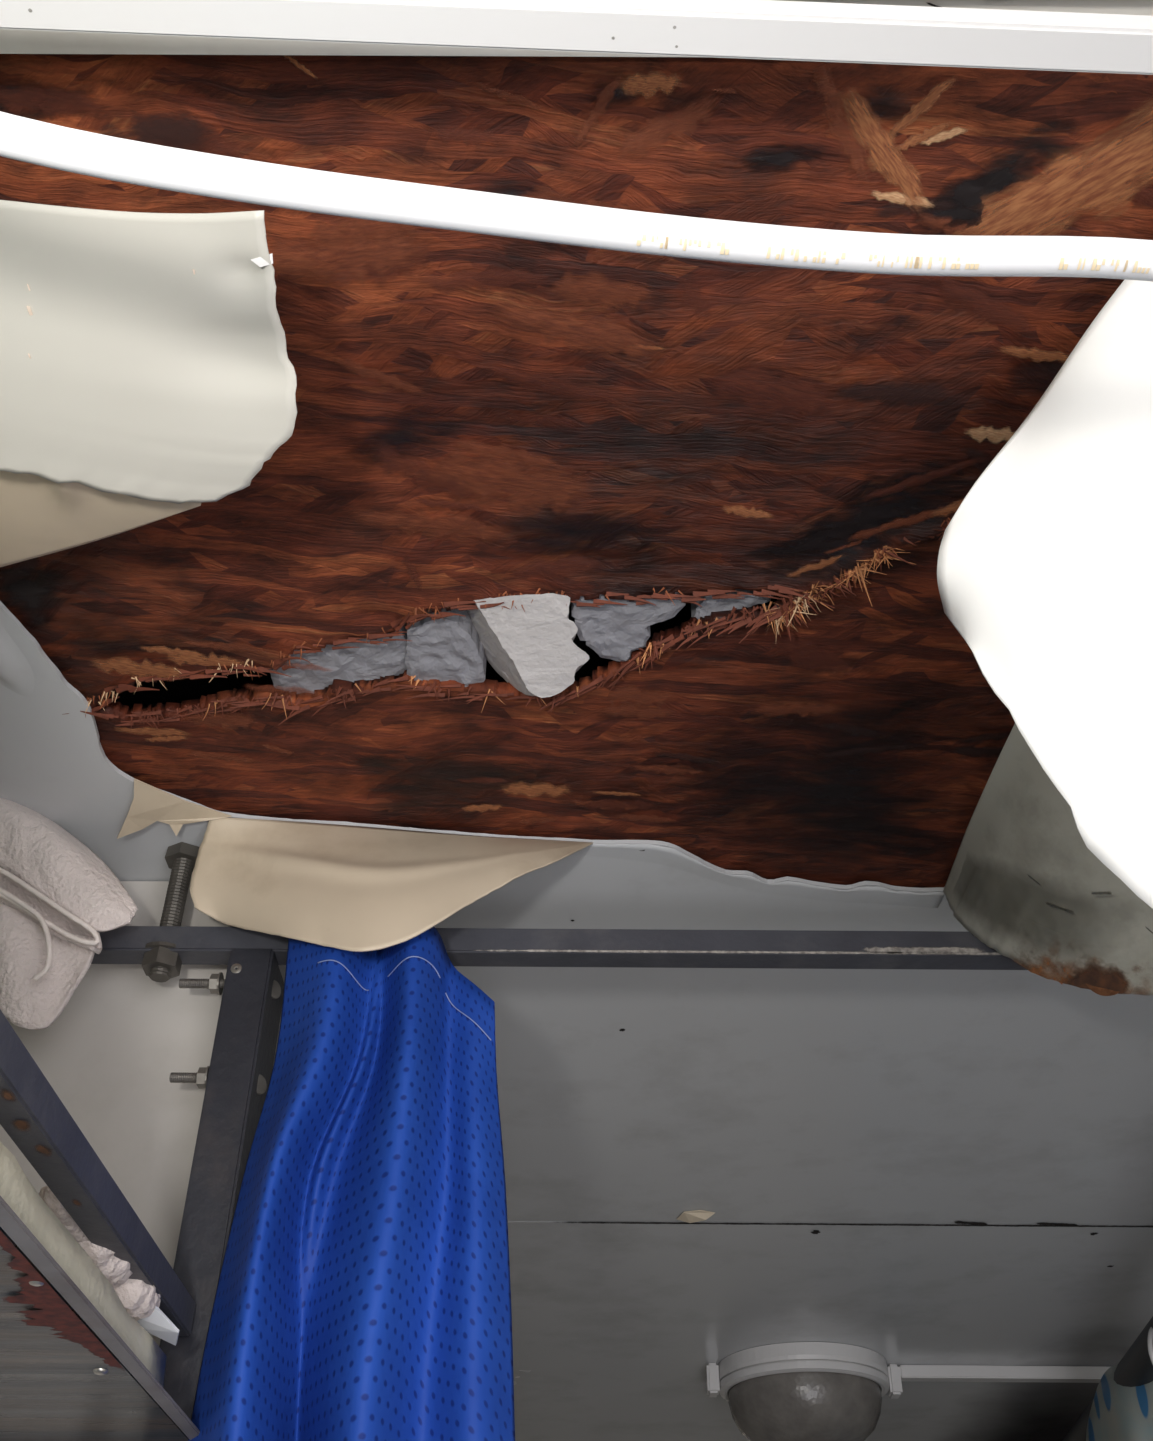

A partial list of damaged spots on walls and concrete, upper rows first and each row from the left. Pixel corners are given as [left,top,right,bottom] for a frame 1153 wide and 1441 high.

peeling [117,778,593,952]
rust [1021,958,1128,994]
rust [0,1231,125,1371]